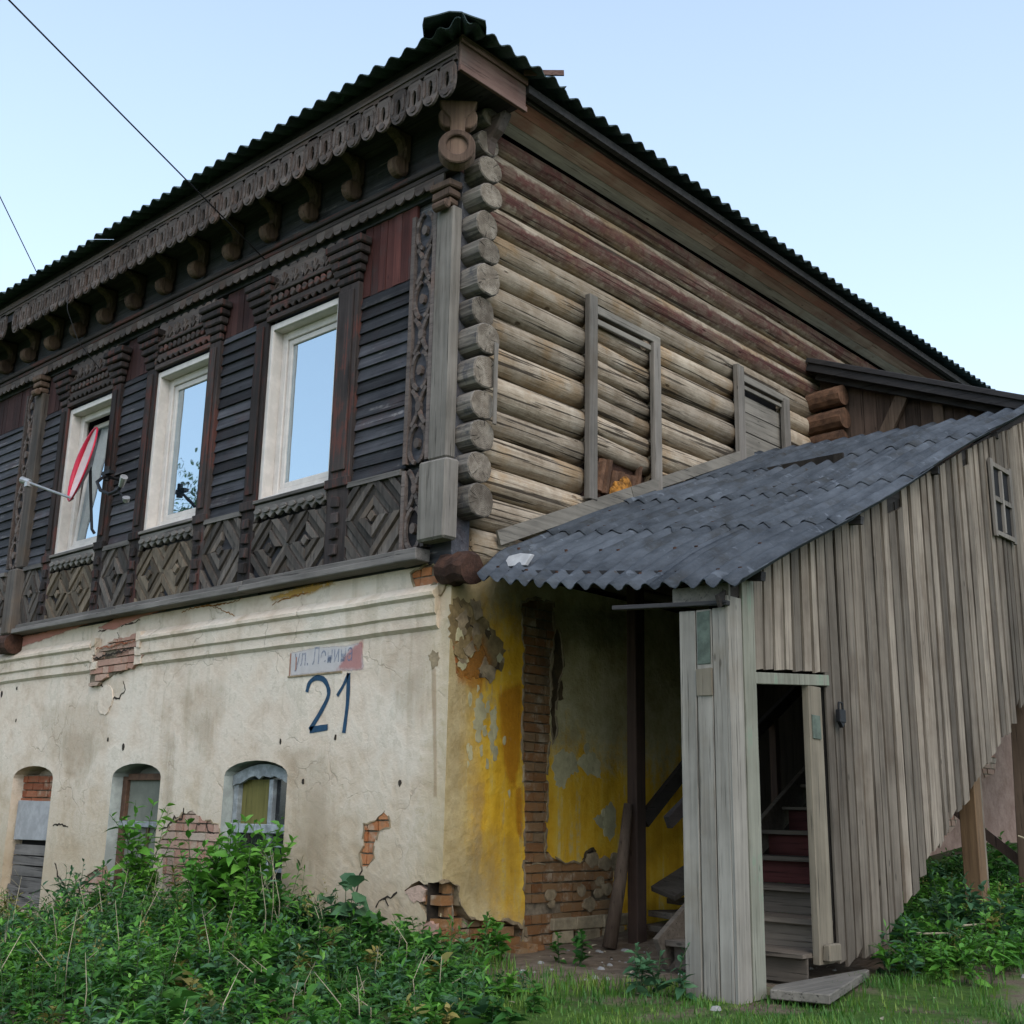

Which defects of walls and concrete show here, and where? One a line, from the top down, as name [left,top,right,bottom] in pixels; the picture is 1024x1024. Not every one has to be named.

peeling [22,624,86,646]
flaking render [88,610,164,687]
peeling [410,563,506,769]
flaking render [405,596,617,957]
flaking render [158,808,222,887]
flaking render [356,812,391,892]